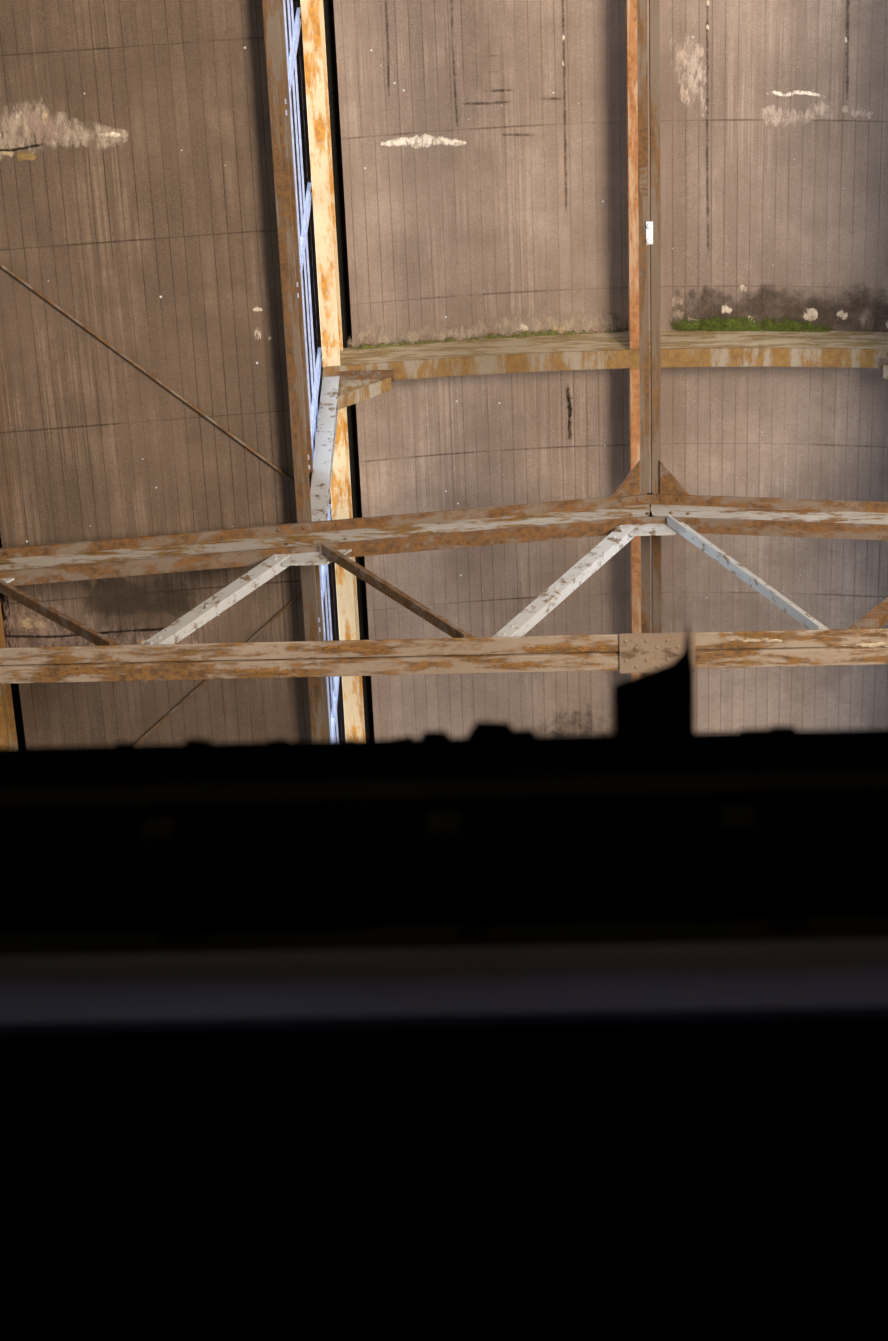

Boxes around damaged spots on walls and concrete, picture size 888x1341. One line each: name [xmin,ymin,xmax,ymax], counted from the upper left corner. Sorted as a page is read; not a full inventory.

damp [0,100,128,161]
damp [381,134,466,149]
damp [349,309,627,348]
damp [671,285,888,332]